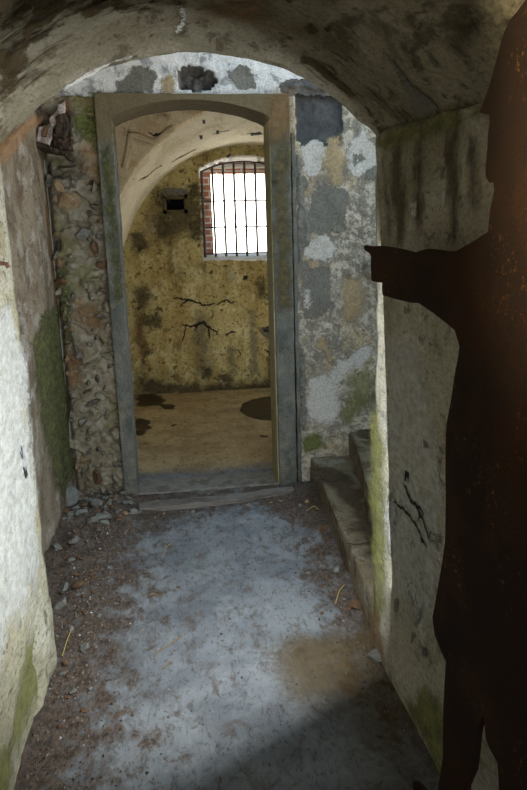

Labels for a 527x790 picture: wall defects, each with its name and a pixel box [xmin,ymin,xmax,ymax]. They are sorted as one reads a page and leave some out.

flaking render [0,0,157,106]
water stain [65,56,132,89]
spalling [115,53,256,94]
flaking render [279,51,377,320]
spalling [37,95,125,495]
crack [173,297,243,359]
water stain [0,309,39,658]
crack [394,484,429,547]